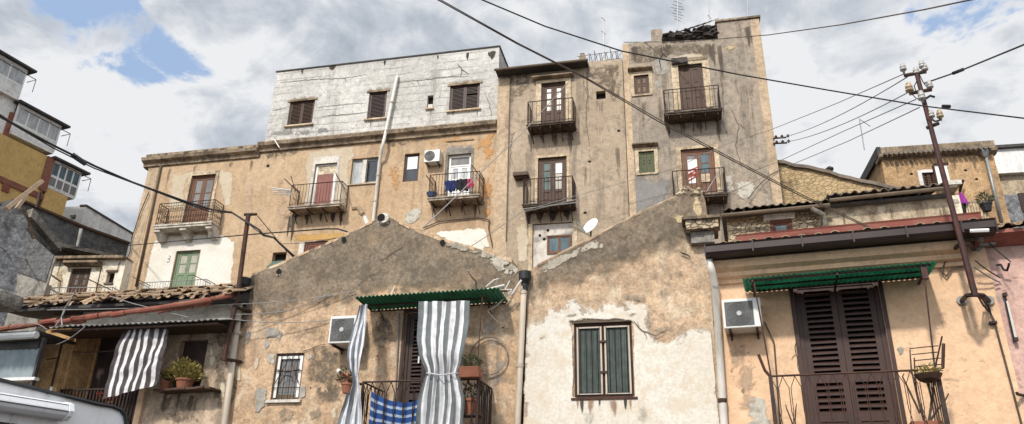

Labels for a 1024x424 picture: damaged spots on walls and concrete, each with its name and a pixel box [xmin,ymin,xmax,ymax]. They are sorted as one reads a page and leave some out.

peeling [436,217,528,275]
peeling [523,294,720,424]